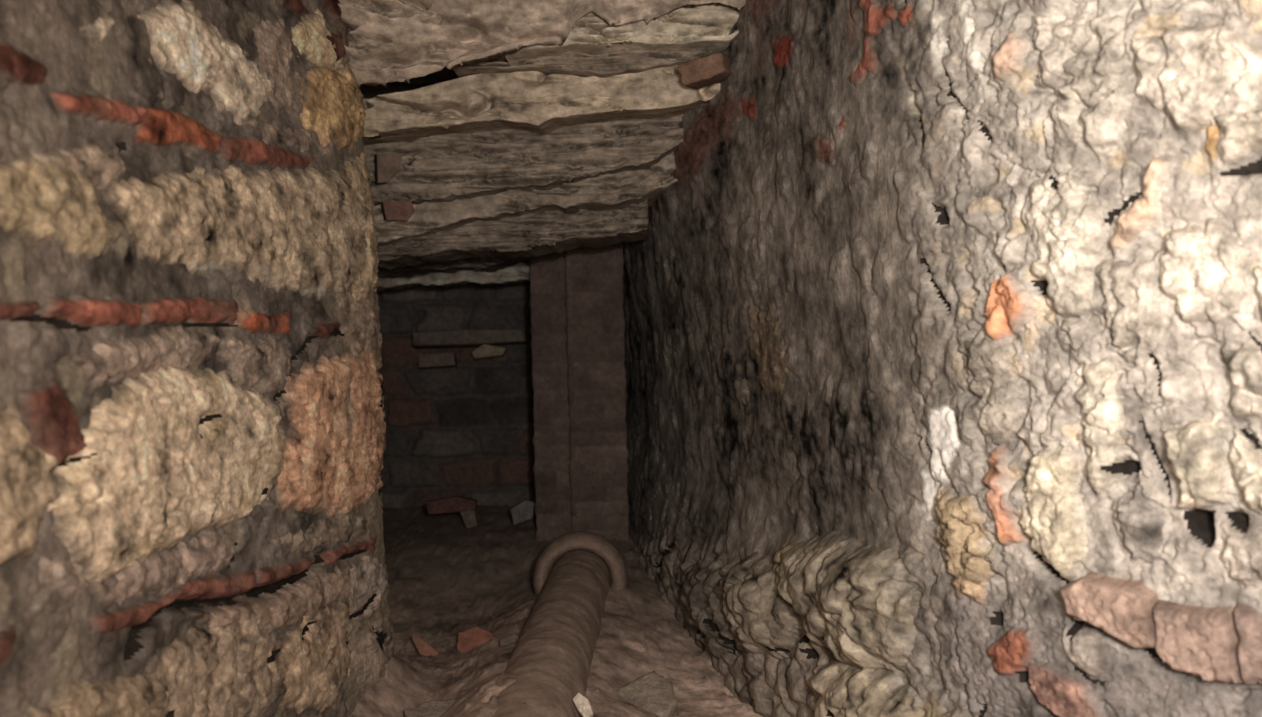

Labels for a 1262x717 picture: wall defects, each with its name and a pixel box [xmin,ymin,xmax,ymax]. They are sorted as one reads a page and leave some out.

spalling [1219,157,1262,176]